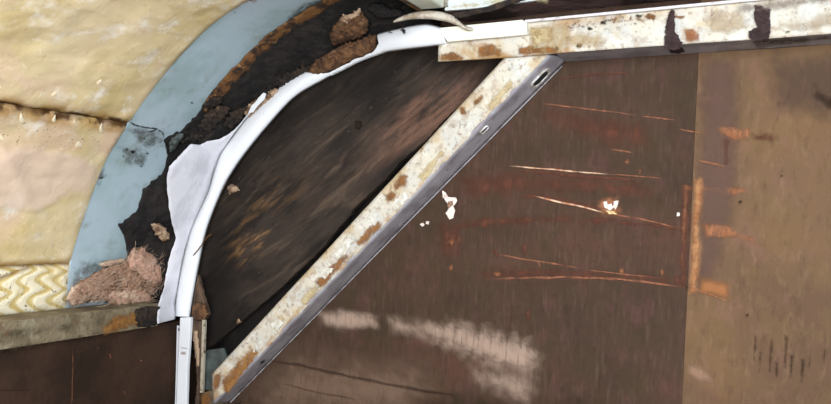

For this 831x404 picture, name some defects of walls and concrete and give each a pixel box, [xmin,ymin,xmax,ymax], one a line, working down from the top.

corrosion [386,175,408,201]
peeling [393,192,409,209]
peeling [442,191,457,220]
peeling [599,198,619,215]
corrosion [357,222,381,245]
corrosion [649,180,737,296]
peeling [321,238,355,279]
corrosion [301,255,347,304]
damp [322,311,376,328]
damp [392,321,536,370]
corrosion [201,349,258,404]
damp [492,377,526,397]